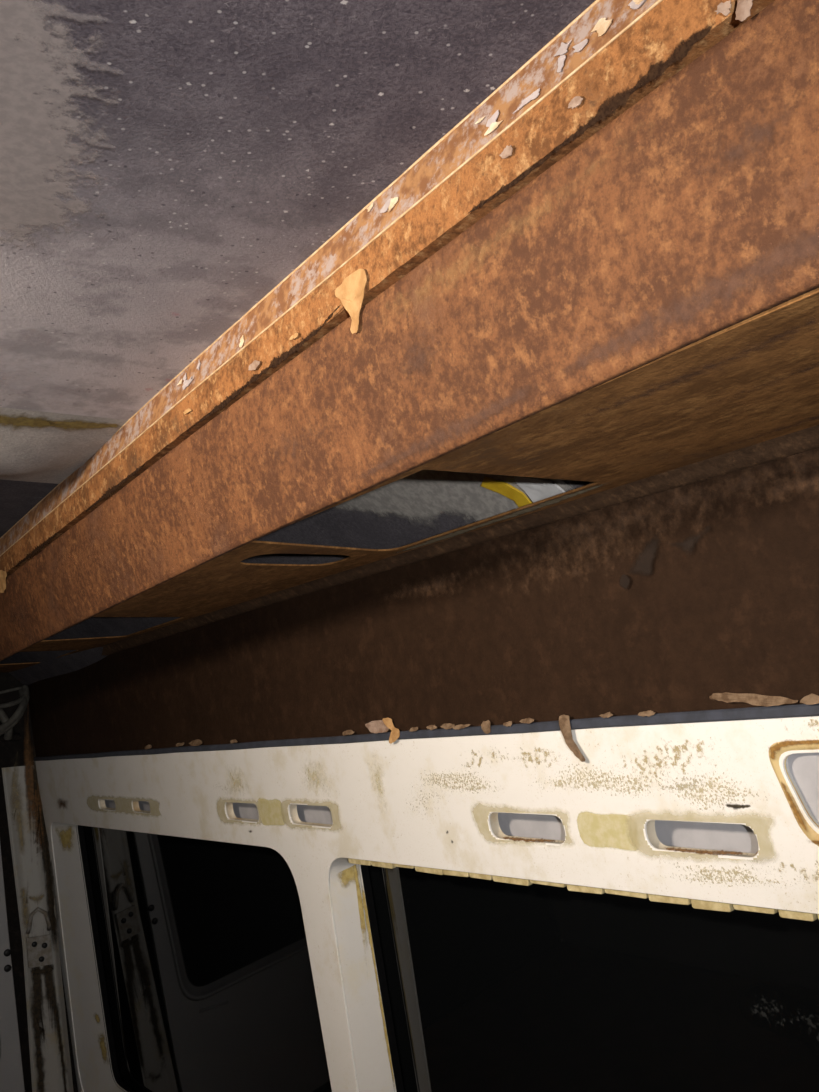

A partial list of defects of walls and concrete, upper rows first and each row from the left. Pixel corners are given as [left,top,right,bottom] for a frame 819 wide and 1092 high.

peeling [715,0,753,22]
leakage [0,0,117,244]
crack [468,24,714,213]
peeling [335,269,367,334]
crack [187,306,340,432]
corrosion [545,488,706,572]
peeling [709,692,819,707]
peeling [365,718,534,744]
peeling [559,715,585,762]
corrosion [770,740,819,759]
corrosion [782,783,806,830]
corrosion [667,847,819,887]